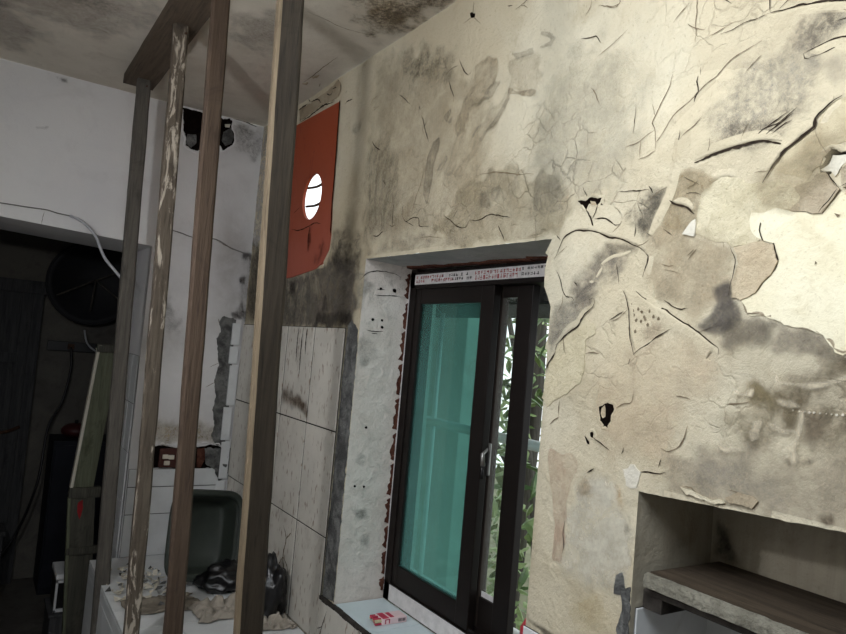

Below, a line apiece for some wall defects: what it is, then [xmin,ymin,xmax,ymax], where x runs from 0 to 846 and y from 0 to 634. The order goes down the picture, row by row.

crack [299,58,379,122]
crack [620,0,846,214]
crack [374,176,439,238]
crack [446,211,510,239]
spalling [682,97,846,356]
crack [545,189,719,368]
water stain [694,250,769,345]
water stain [777,330,846,361]
spalling [153,440,178,468]
peeling [195,316,236,481]
crack [643,426,688,474]
water stain [748,381,845,462]